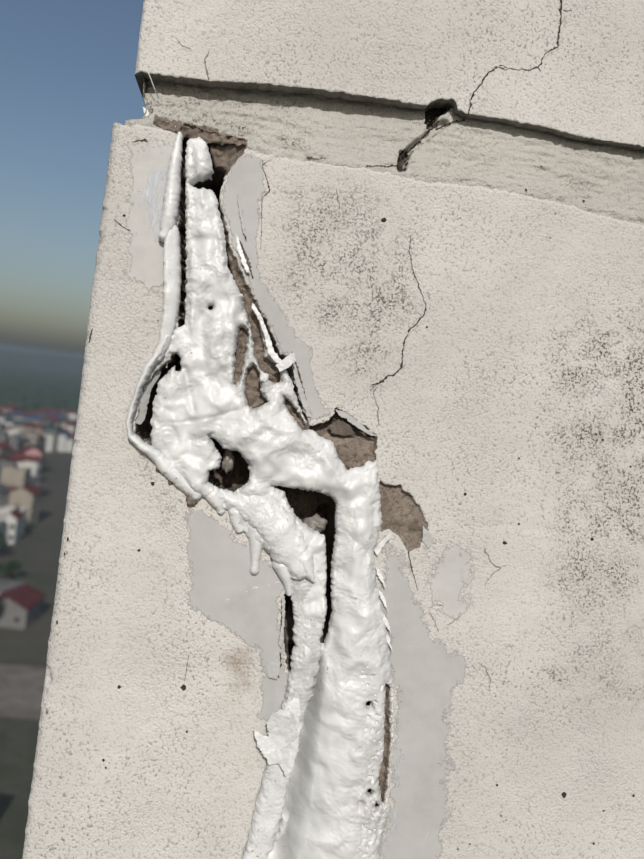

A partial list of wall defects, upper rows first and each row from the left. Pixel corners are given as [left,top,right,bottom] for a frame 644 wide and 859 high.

crack [466,0,570,114]
spalling [153,114,247,146]
crack [177,123,311,430]
crack [371,239,427,425]
crack [134,354,181,445]
crack [208,438,249,492]
spalling [308,408,378,470]
crack [275,486,336,643]
spalling [374,481,434,556]
crack [225,582,295,679]
peeling [254,684,299,776]
crack [366,684,391,807]